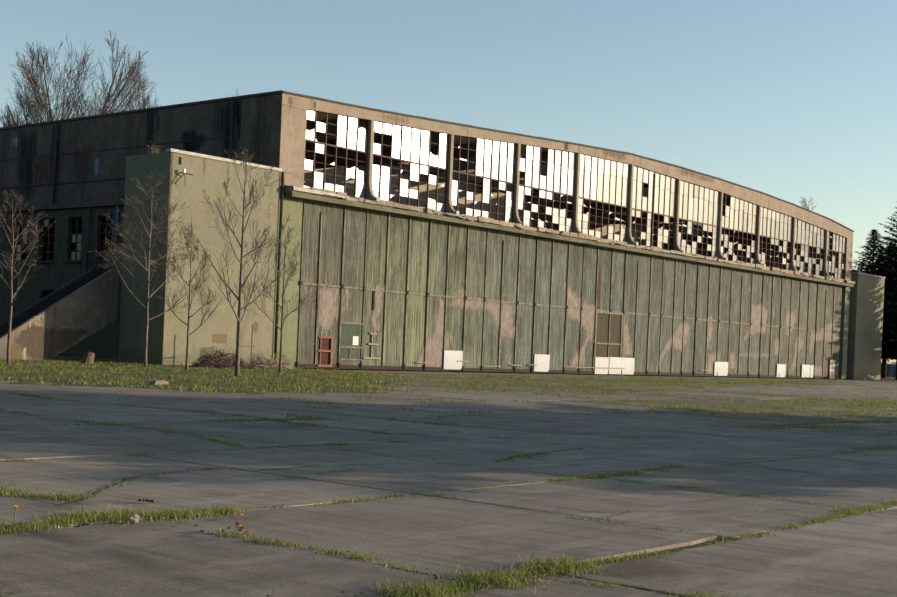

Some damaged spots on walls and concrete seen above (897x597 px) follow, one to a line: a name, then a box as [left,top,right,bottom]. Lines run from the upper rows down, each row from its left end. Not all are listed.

peeling [315,282,351,336]
peeling [414,287,516,371]
peeling [563,279,595,369]
peeling [655,319,692,373]
peeling [706,302,840,377]